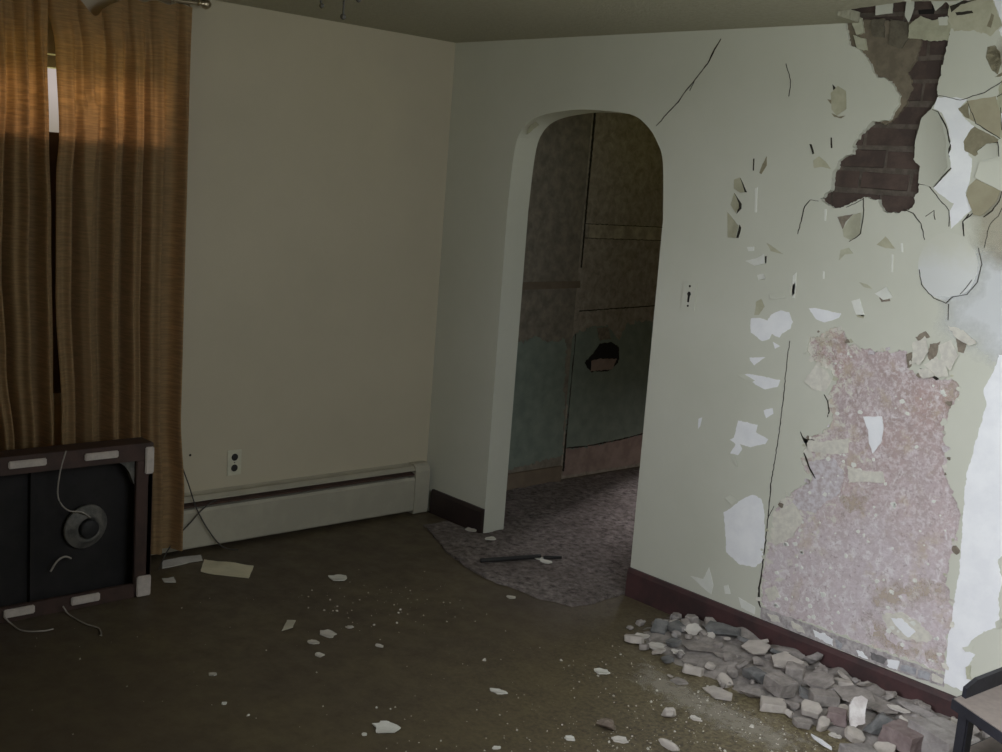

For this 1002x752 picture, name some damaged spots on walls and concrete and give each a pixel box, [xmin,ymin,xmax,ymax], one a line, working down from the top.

crack [656,39,721,126]
peeling [727,177,758,238]
spalling [810,0,1002,260]
peeling [508,320,653,476]
crack [758,341,816,608]
spalling [691,255,1002,691]